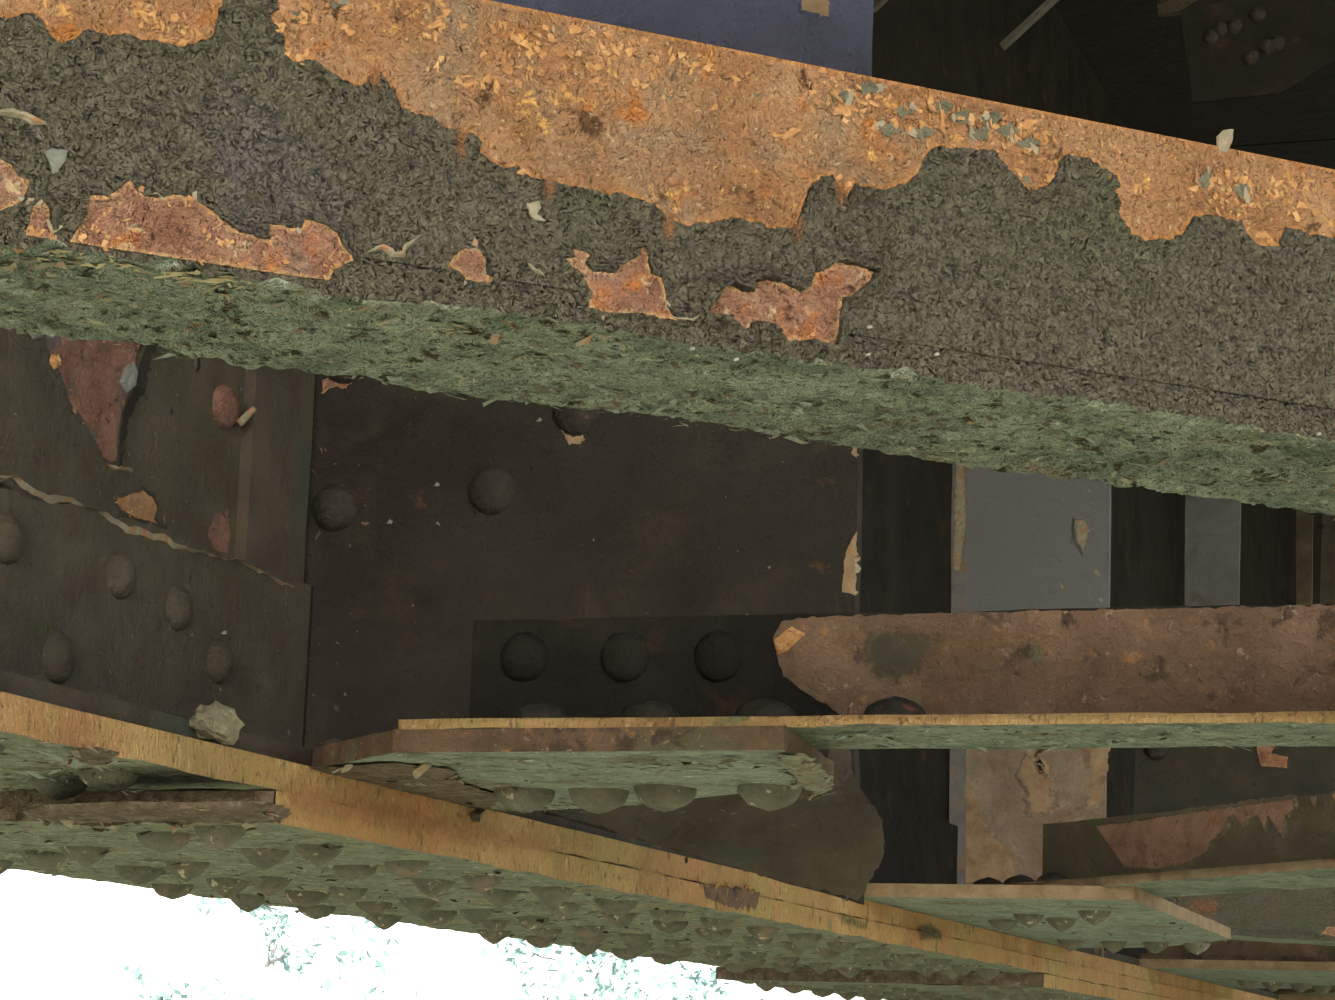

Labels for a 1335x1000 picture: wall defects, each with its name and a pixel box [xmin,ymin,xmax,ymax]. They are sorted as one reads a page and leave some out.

rust [255,0,1335,261]
rust [438,237,502,293]
rust [554,238,888,363]
rust [41,335,145,465]
rust [842,532,861,596]
rust [1071,515,1092,556]
rust [773,604,1335,715]
rust [1014,749,1057,819]